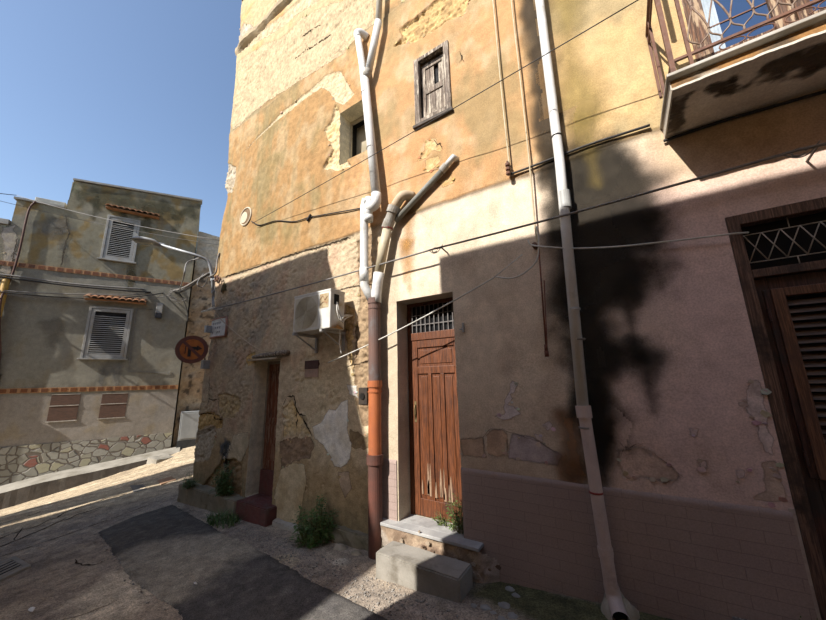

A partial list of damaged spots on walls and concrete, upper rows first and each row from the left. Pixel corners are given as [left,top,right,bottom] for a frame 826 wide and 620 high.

spalling [395,0,469,46]
flaking render [232,0,374,171]
leakage [704,43,826,97]
leakage [667,92,692,134]
spalling [418,138,442,172]